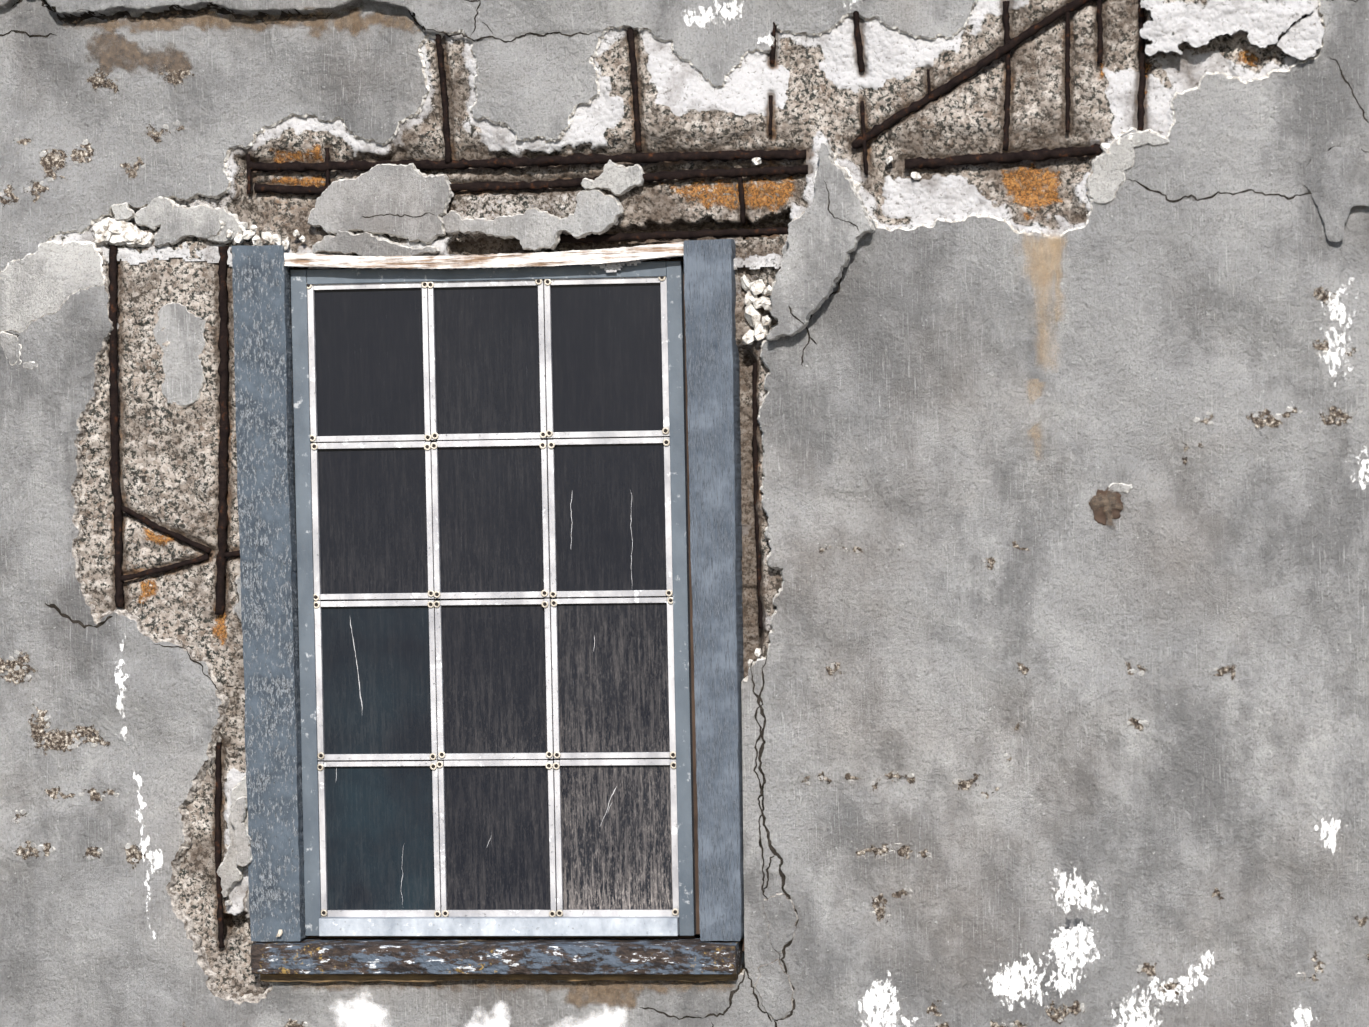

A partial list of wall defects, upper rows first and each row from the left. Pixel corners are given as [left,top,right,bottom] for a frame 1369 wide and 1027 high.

crack [0,0,332,38]
crack [1126,58,1369,203]
corrosion [270,144,326,187]
corrosion [669,176,795,211]
corrosion [1002,163,1063,220]
spalling [0,0,1326,685]
corrosion [143,528,175,545]
corrosion [139,580,158,604]
spalling [71,219,273,1005]
peeling [44,786,119,802]
crack [639,648,799,1027]